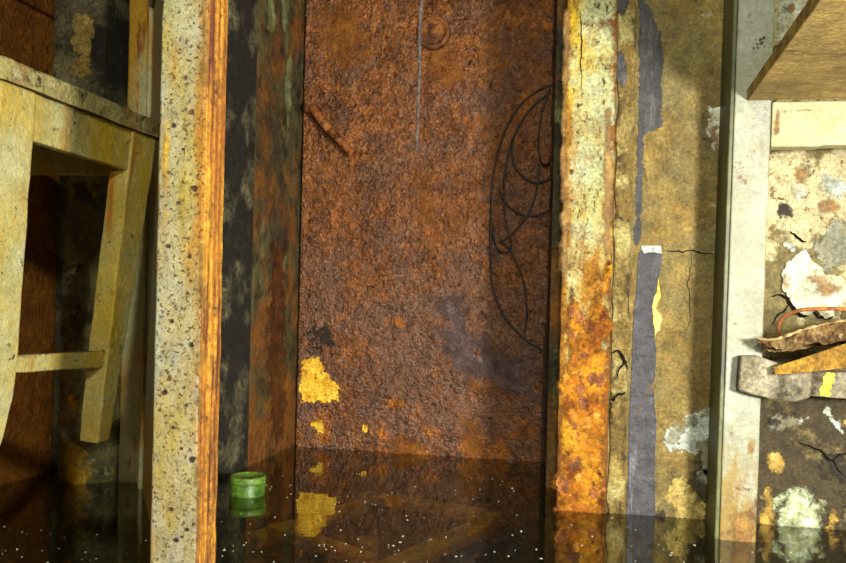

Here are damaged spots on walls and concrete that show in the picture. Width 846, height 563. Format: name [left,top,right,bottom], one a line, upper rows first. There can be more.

spalling [705,105,720,153]
spalling [820,172,846,201]
rust [552,10,614,544]
peeling [616,0,709,546]
crack [665,250,715,334]
peeling [781,219,846,320]
crack [799,442,846,476]